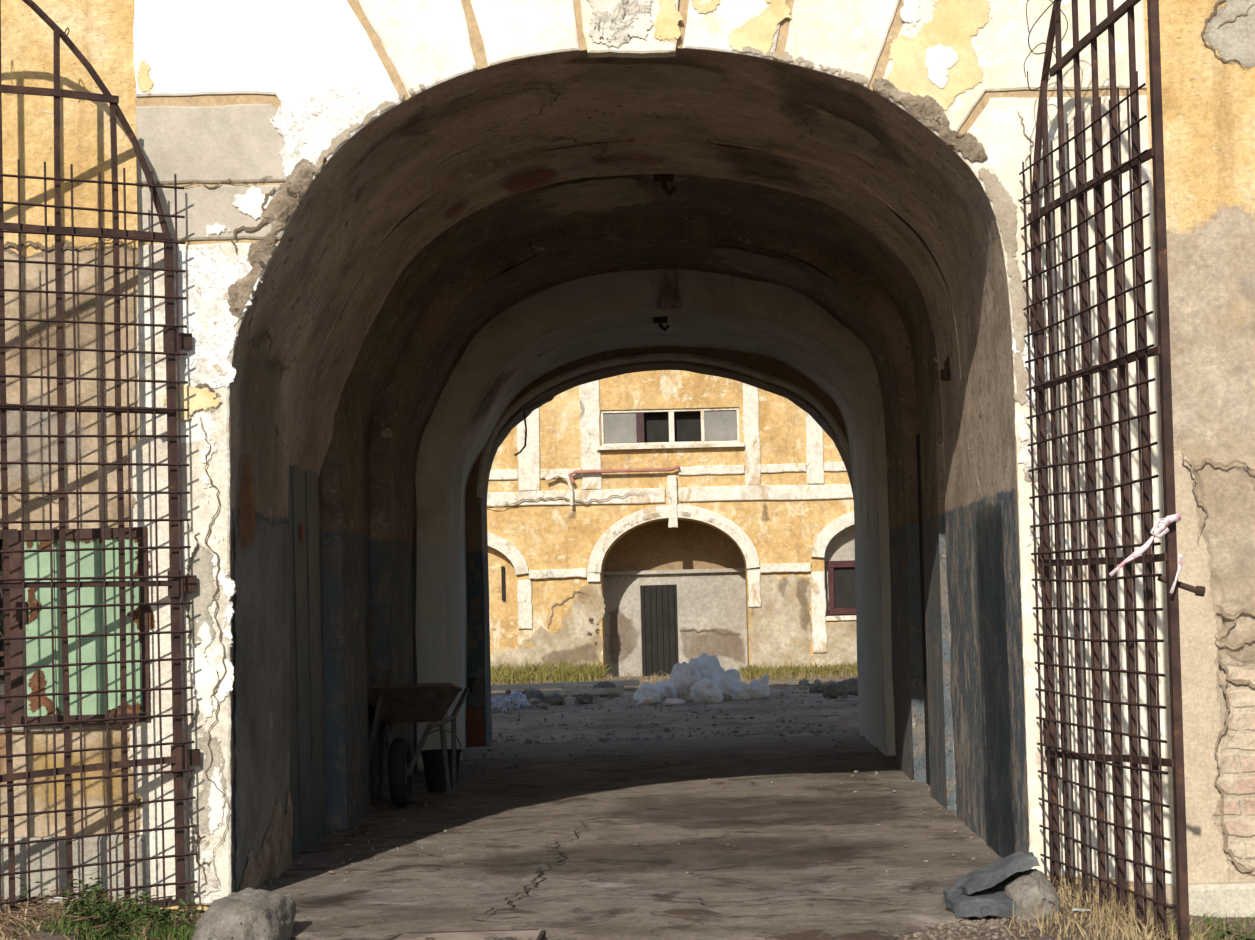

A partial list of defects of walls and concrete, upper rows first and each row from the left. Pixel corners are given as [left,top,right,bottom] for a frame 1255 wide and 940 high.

spalling [587,0,720,48]
peeling [728,0,869,84]
peeling [886,0,992,110]
spalling [1204,0,1255,67]
peeling [269,78,439,180]
peeling [232,186,273,222]
peeling [161,221,263,504]
peeling [1153,205,1255,501]
peeling [0,240,236,902]
spalling [1209,571,1255,882]
spalling [239,791,293,891]
crack [470,820,917,914]